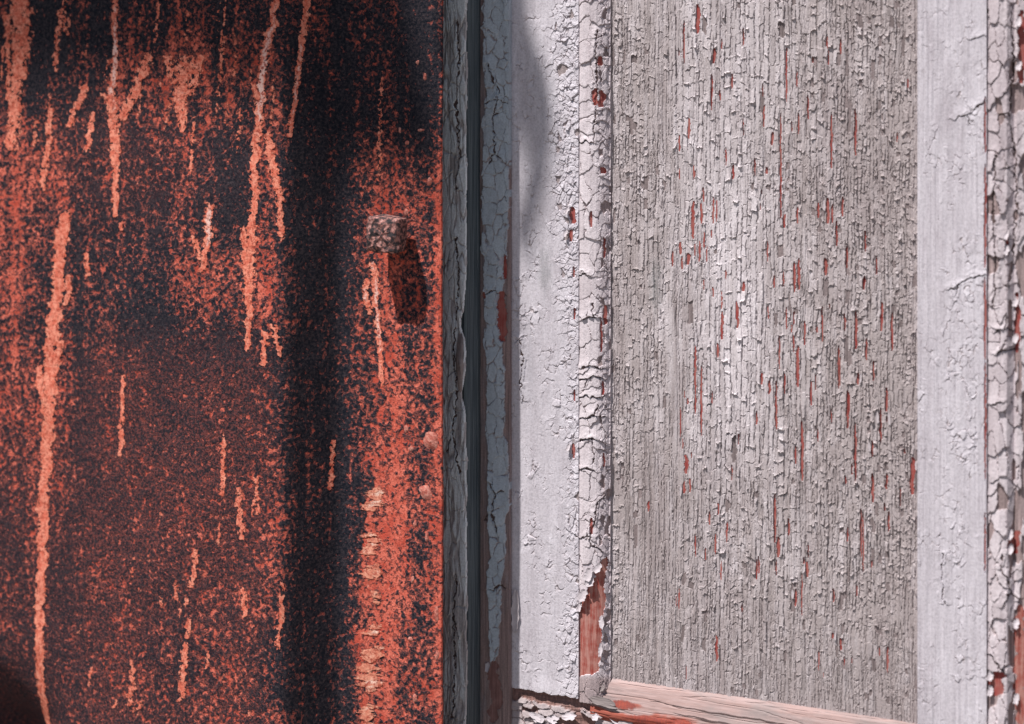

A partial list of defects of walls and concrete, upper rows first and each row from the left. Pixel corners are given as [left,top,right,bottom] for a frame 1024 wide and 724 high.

corrosion [0,0,55,191]
corrosion [66,0,206,231]
corrosion [215,0,285,367]
crack [579,30,605,144]
peeling [1015,10,1024,84]
corrosion [33,210,72,724]
corrosion [362,251,385,387]
peeling [760,304,830,430]
peeling [837,312,891,484]
corrosion [155,549,198,702]
peeling [576,557,608,676]
peeling [529,712,577,724]